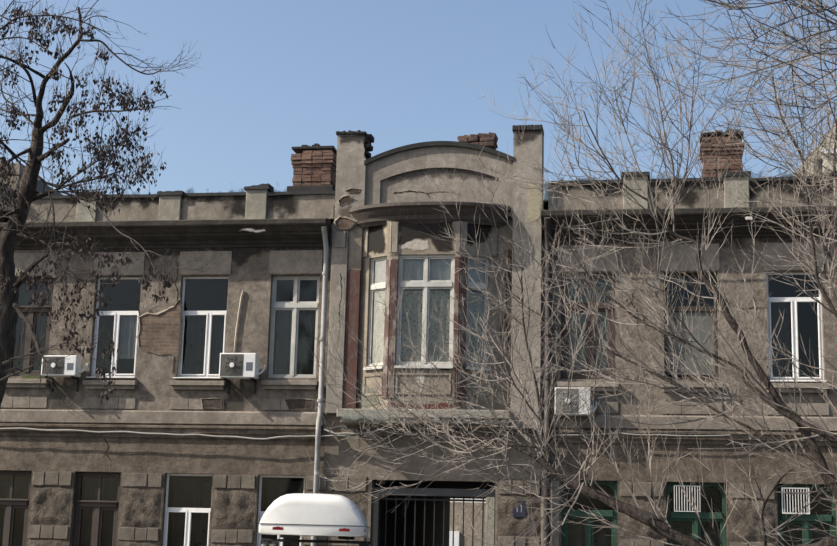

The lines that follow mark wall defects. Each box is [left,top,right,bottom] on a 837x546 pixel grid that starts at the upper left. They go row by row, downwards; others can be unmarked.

flaking render [337,188,361,206]
peeling [386,220,429,255]